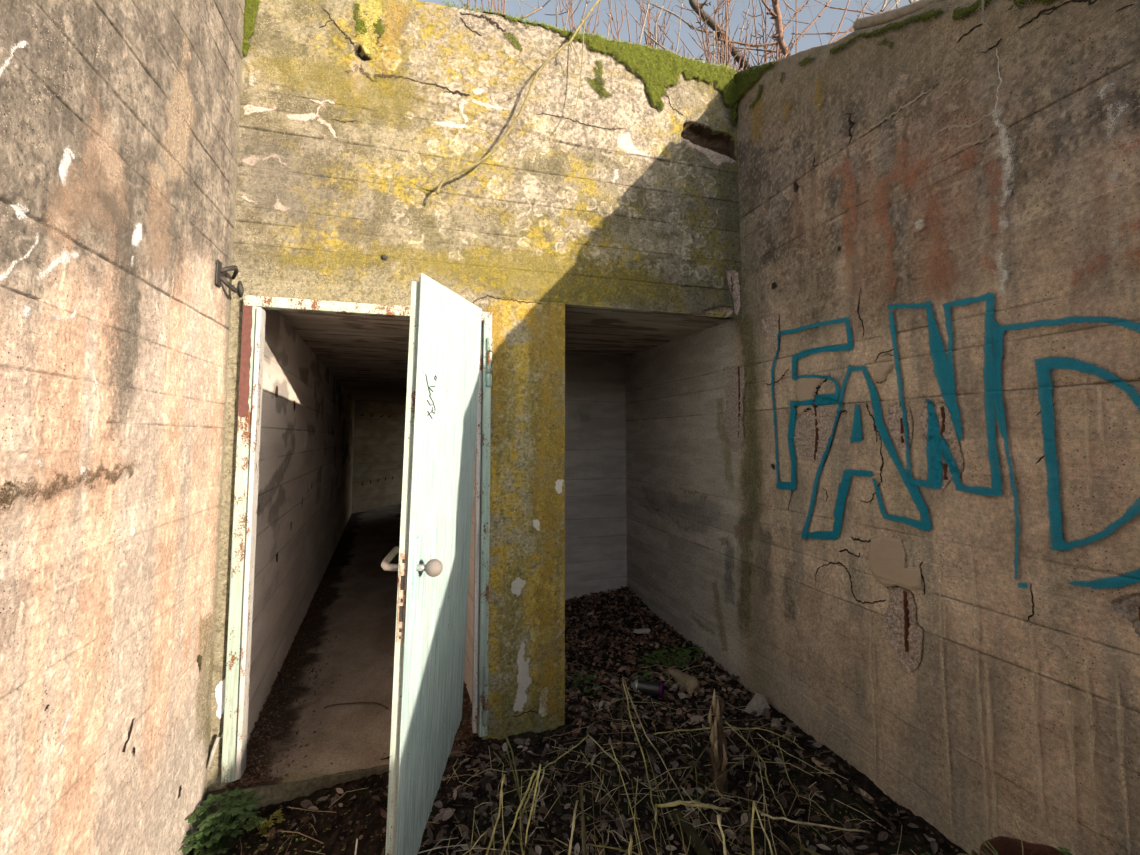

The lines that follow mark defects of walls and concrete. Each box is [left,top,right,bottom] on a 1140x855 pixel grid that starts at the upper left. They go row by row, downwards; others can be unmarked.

crack [319,8,470,96]
spalling [681,121,736,160]
crack [845,77,964,144]
damp [989,108,1018,232]
crack [940,0,1134,151]
damp [995,252,1010,294]
spalling [794,395,844,465]
spalling [887,402,964,489]
crack [815,537,925,604]
spalling [883,586,924,672]
spalling [1111,593,1140,637]
peeling [513,641,549,717]